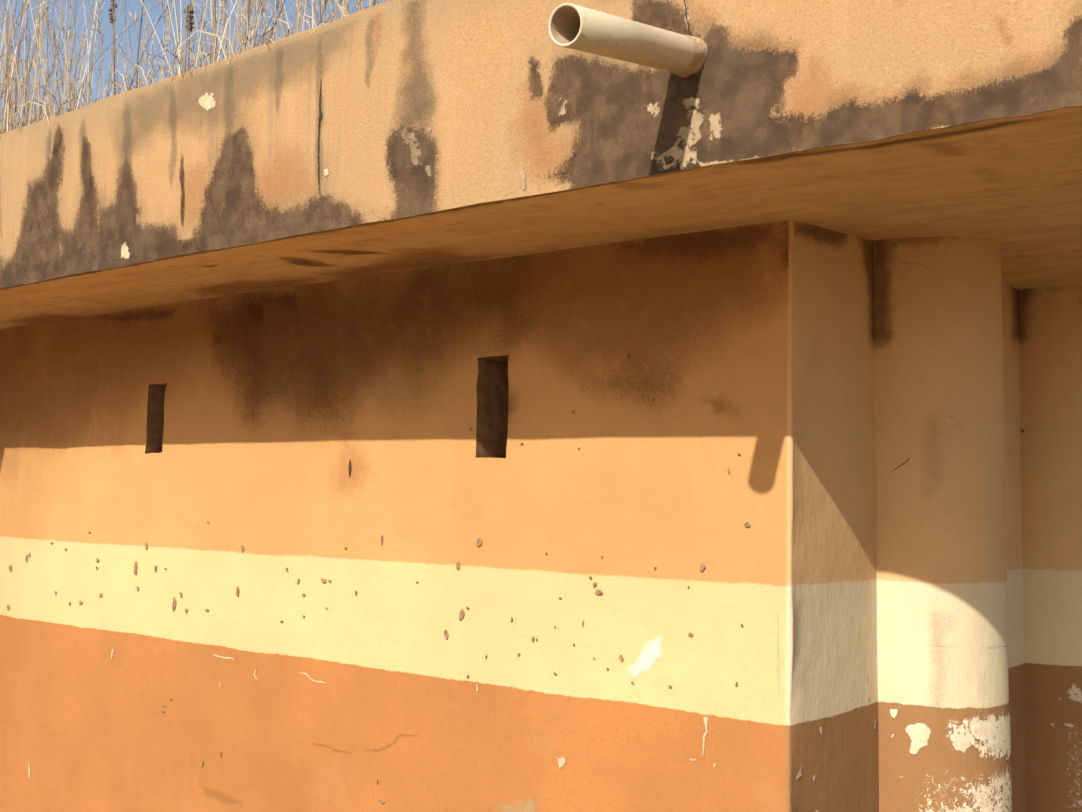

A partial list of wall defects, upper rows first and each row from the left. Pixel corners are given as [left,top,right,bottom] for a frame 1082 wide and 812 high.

leakage [0,0,1082,290]
peeling [645,102,663,117]
peeling [651,97,758,171]
peeling [1058,683,1082,703]
peeling [891,710,1012,812]
peeling [1051,723,1082,812]